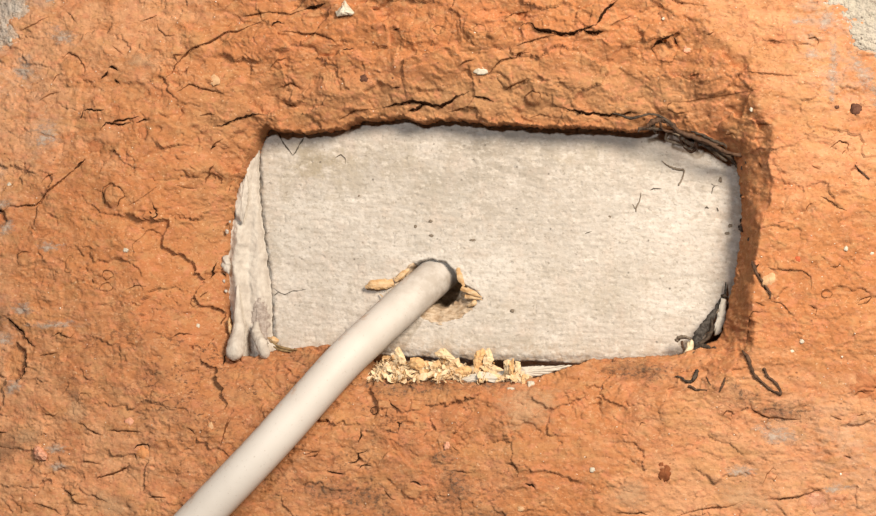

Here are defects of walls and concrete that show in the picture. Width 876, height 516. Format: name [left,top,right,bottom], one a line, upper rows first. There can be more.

crack [143,3,353,94]
crack [460,0,630,72]
crack [339,78,635,120]
crack [0,159,85,212]
crack [102,182,162,253]
crack [178,113,264,189]
peeling [235,174,249,224]
crack [277,132,305,155]